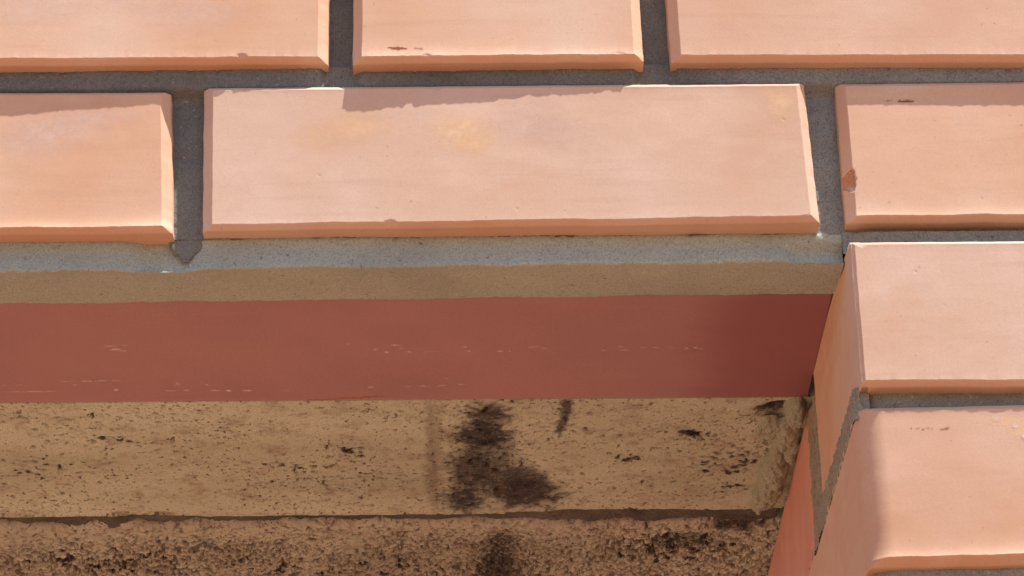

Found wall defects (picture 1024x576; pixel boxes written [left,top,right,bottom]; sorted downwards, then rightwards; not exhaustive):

spalling [842,170,856,192]
damp [557,400,572,435]
damp [443,402,562,511]